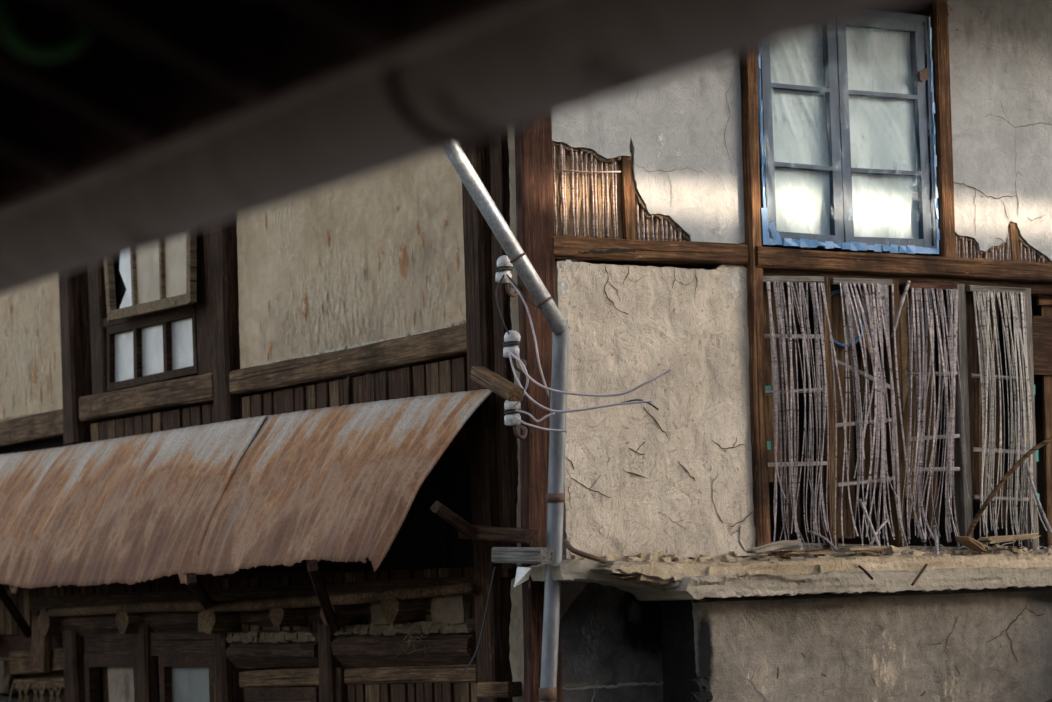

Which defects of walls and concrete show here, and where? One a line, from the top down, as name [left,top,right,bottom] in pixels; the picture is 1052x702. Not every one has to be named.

spalling [552,141,689,241]
crack [635,164,697,202]
crack [954,103,1052,243]
spalling [955,222,1051,263]
crack [604,267,641,315]
crack [565,407,668,509]
crack [927,616,958,662]
crack [987,599,1045,663]
spalling [689,676,713,702]